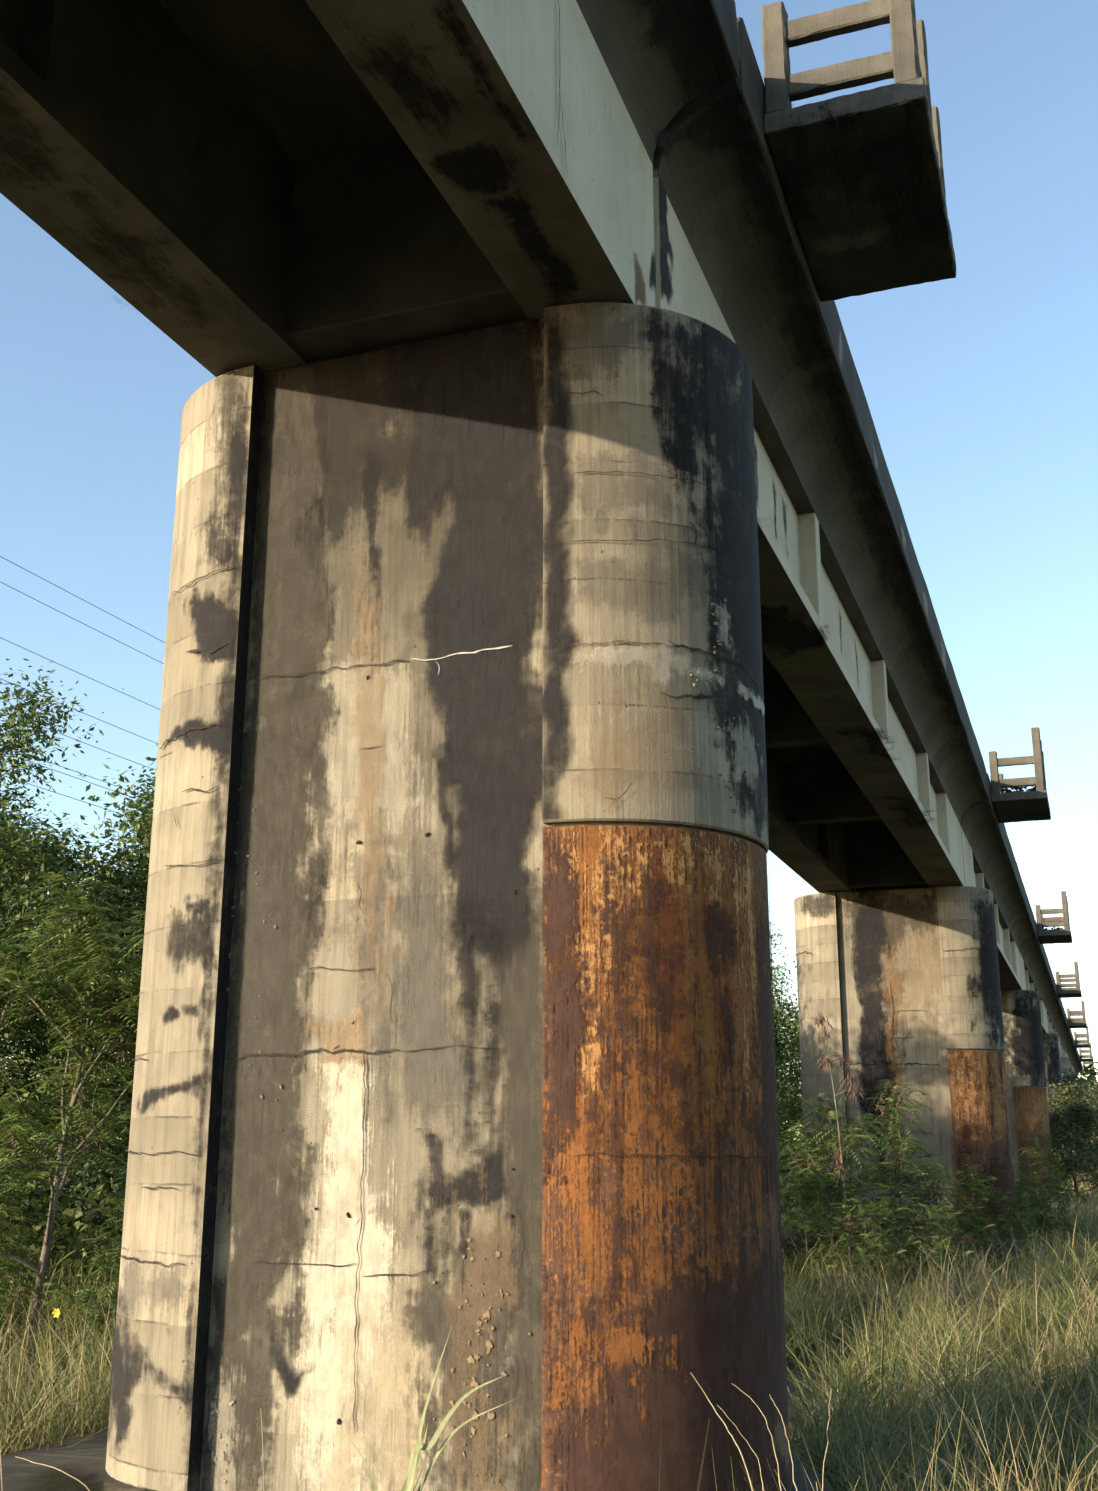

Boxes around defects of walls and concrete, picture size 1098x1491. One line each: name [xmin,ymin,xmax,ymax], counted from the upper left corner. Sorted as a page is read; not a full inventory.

leakage [430,143,579,301]
leakage [633,0,962,727]
leakage [640,177,858,842]
crack [186,642,229,653]
crack [246,646,510,698]
leakage [601,644,690,683]
leakage [839,728,896,760]
leakage [108,318,578,1491]
rust [541,826,791,1491]
leakage [803,890,937,1197]
rust [947,1050,1050,1183]
leakage [23,1468,145,1491]